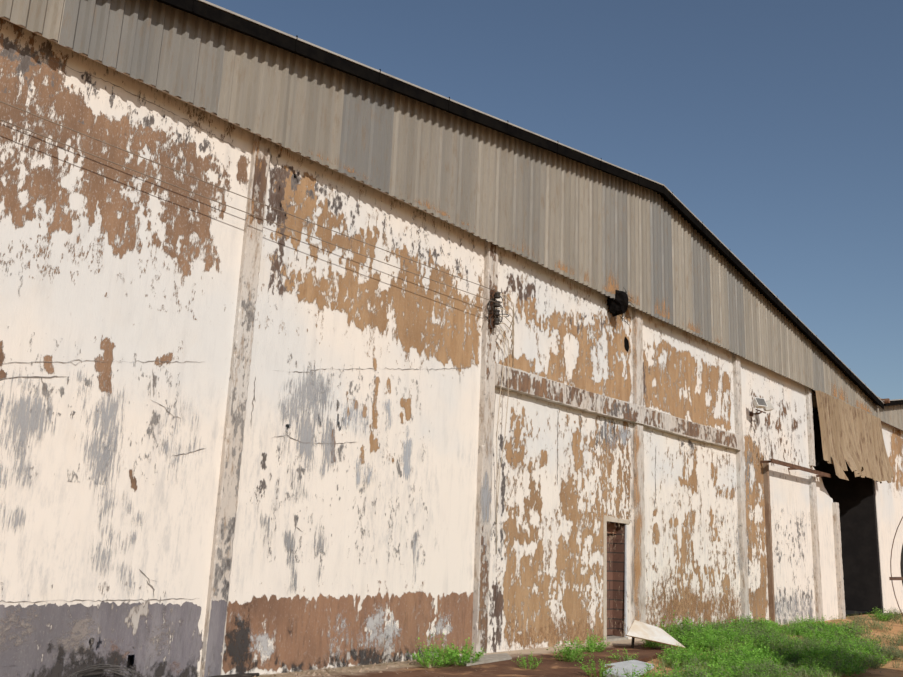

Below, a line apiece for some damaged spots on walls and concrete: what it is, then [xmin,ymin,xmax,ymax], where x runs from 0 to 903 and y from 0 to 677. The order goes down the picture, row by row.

water stain [0,332,196,572]
peeling [0,18,740,674]
peeling [744,376,806,622]
water stain [31,636,199,677]